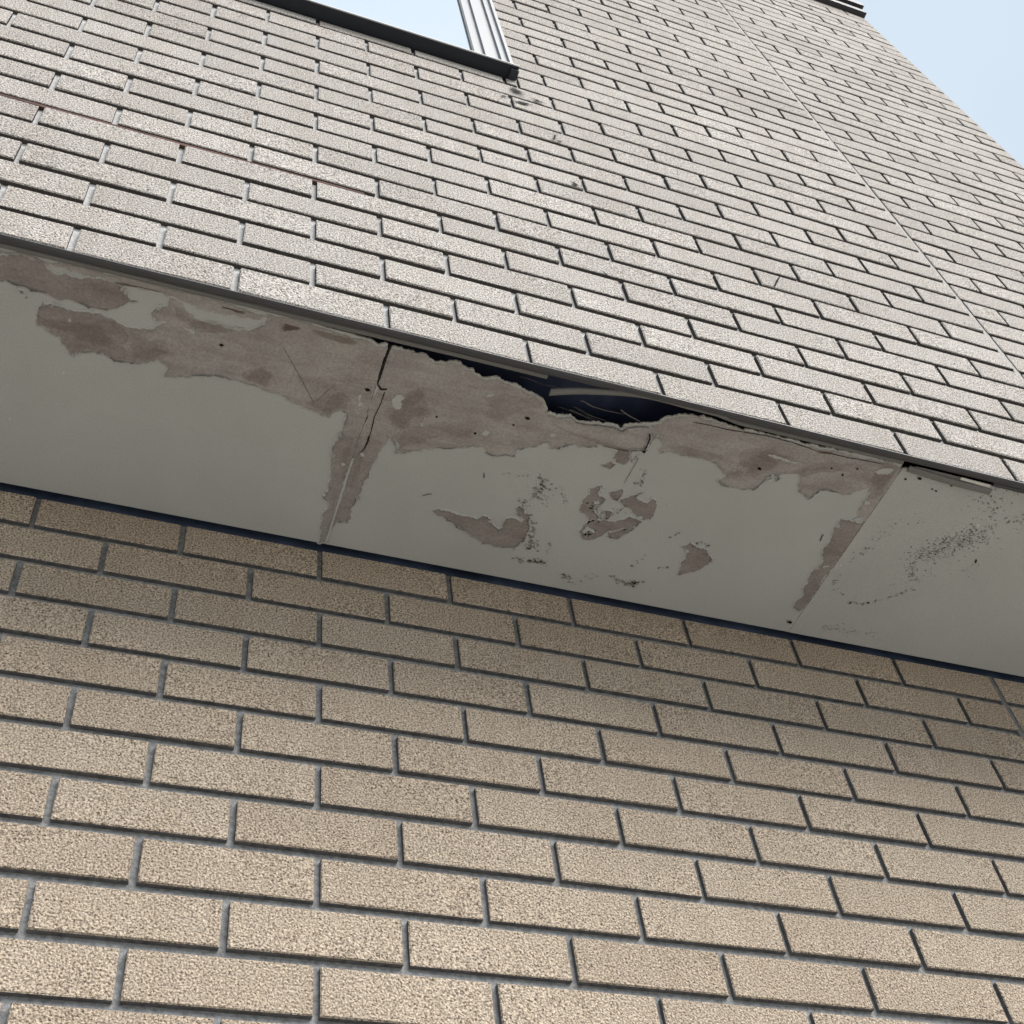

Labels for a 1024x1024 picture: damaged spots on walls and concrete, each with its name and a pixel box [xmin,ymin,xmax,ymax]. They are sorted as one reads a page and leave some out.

crack [360,345,392,453]
peeling [0,250,1024,612]